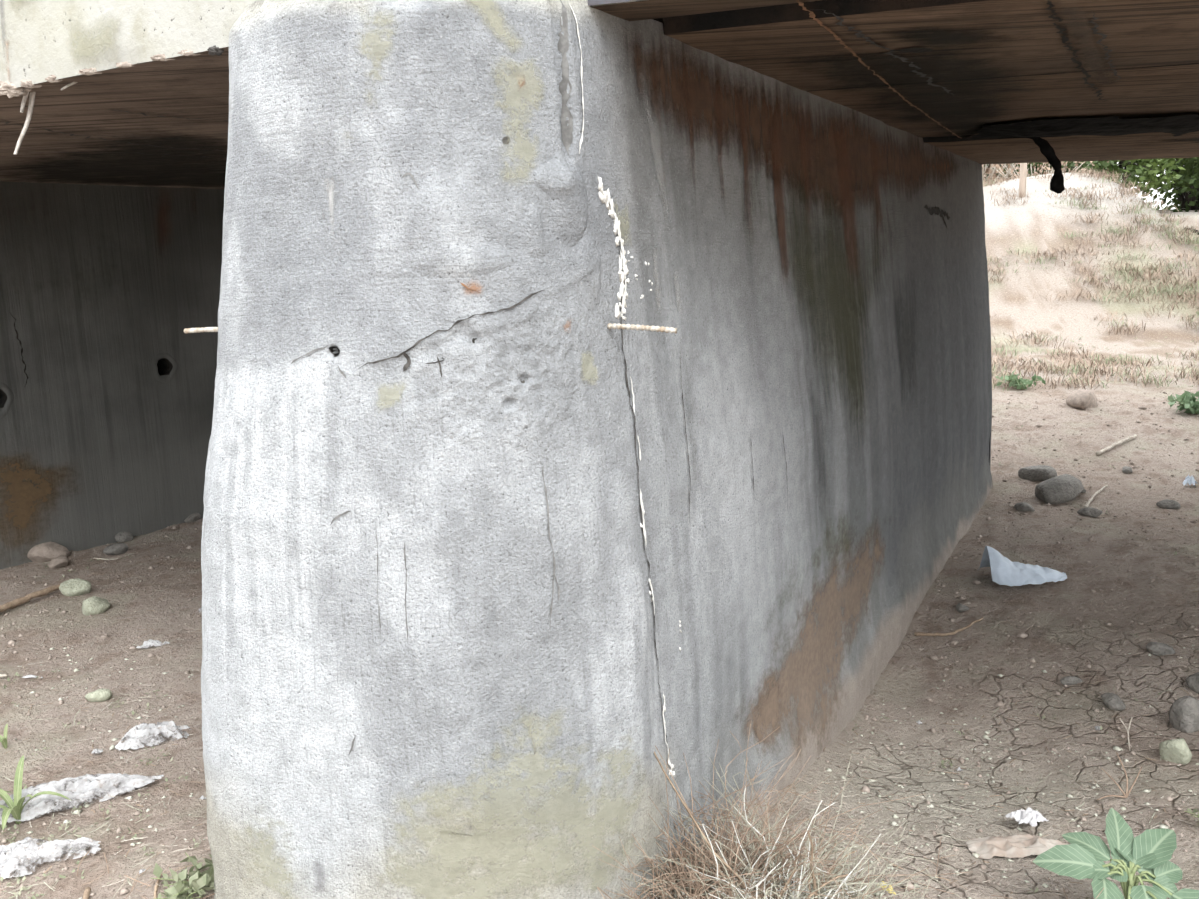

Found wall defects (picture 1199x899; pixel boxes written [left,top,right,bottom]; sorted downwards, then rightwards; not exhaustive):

crack [291,290,544,378]
crack [598,177,682,777]